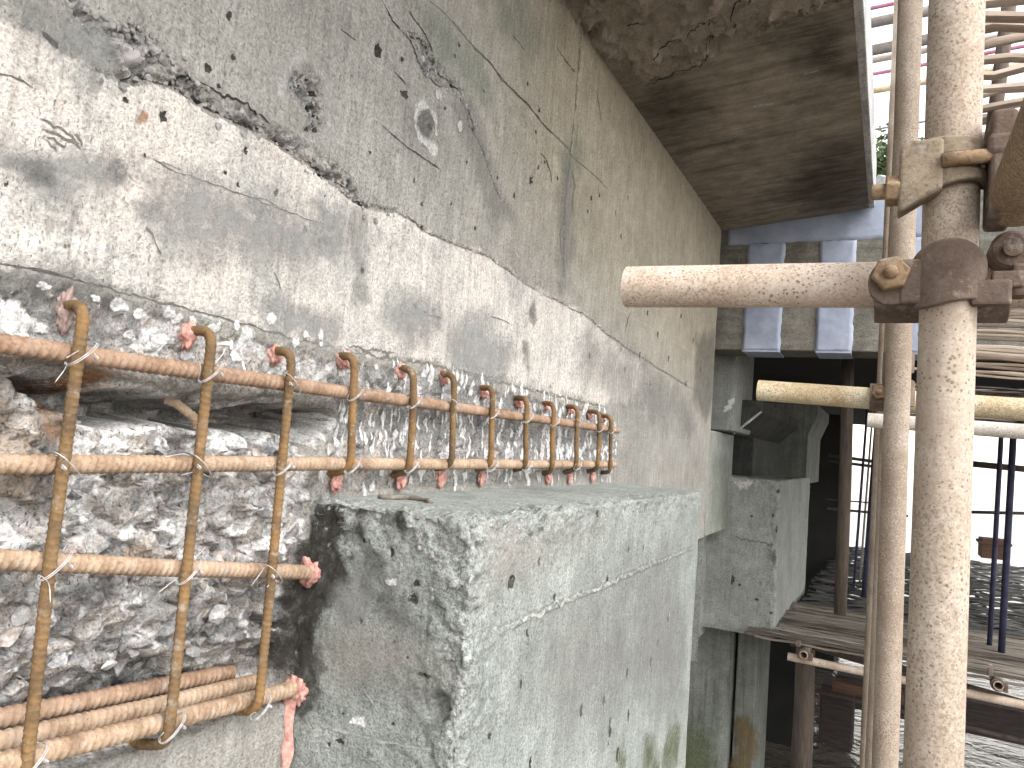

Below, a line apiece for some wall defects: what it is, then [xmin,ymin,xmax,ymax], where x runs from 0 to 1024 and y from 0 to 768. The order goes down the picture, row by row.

crack [644,0,751,87]
crack [380,1,500,198]
crack [477,50,552,181]
crack [145,156,332,229]
spalling [0,357,70,455]
rust [22,375,68,441]
rust [80,365,111,392]
peeling [163,306,253,370]
spalling [0,474,55,552]
spalling [0,570,42,708]
damp [255,495,397,717]
spalling [34,358,701,768]